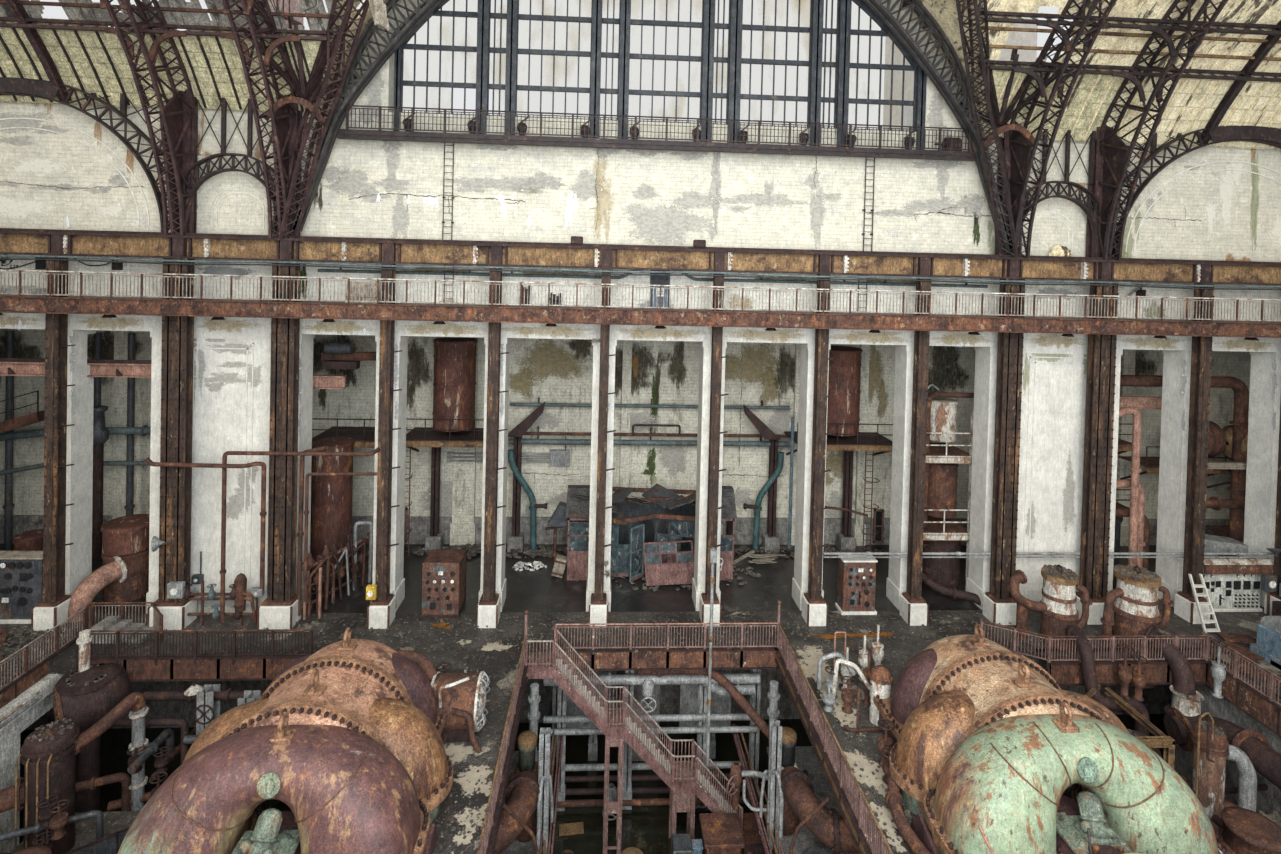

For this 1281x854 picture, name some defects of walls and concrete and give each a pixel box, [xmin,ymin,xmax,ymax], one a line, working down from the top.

peeling [446,141,843,246]
water stain [407,322,478,407]
water stain [615,328,697,397]